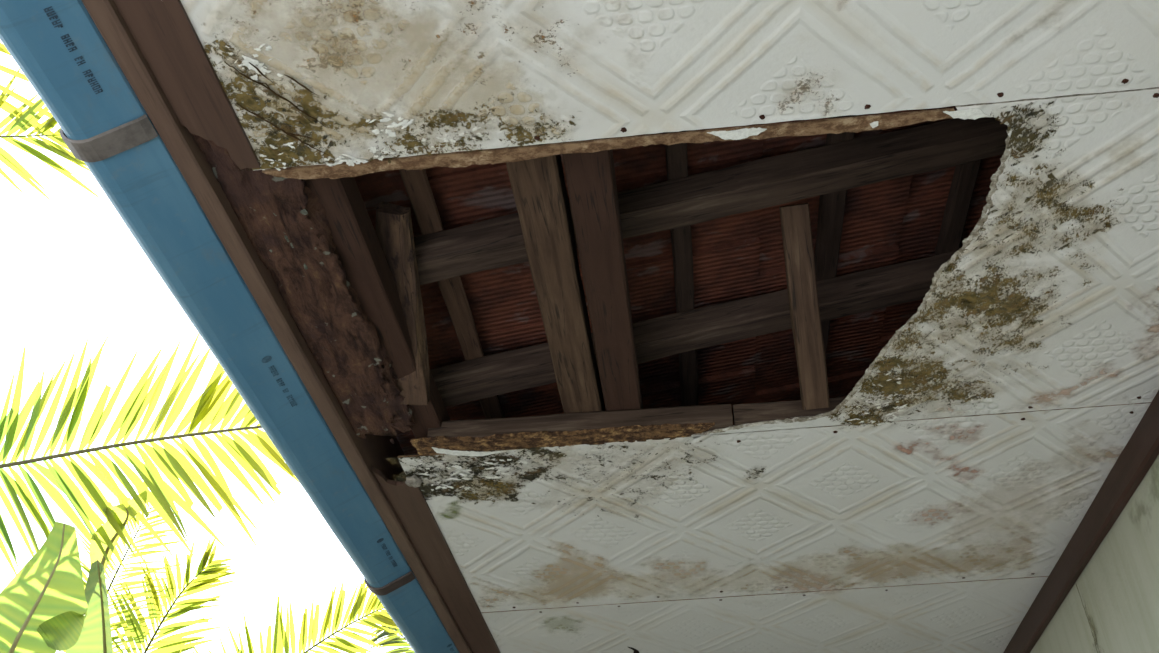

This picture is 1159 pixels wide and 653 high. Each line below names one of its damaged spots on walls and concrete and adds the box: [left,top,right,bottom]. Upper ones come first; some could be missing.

leakage [204,0,576,170]
peeling [260,142,297,171]
peeling [324,112,414,166]
peeling [707,127,767,140]
peeling [943,108,989,120]
spalling [704,136,1012,435]
leakage [828,101,1121,429]
peeling [432,447,506,456]
leakage [388,438,718,518]